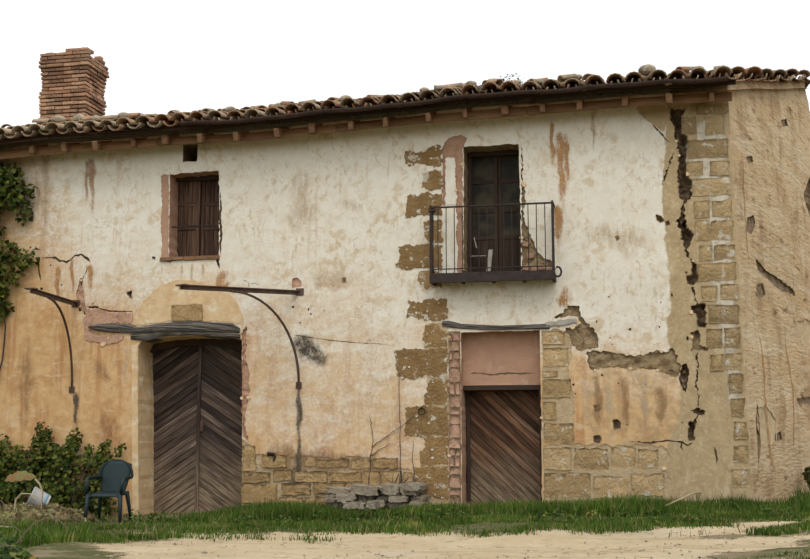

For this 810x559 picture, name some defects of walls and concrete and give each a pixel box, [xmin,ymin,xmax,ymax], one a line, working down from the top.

crack [32,248,90,282]
flaking render [75,278,133,346]
damp [294,335,326,363]
spalling [240,298,462,506]
spalling [395,135,467,289]
spalling [519,148,552,271]
spalling [540,305,689,502]
crack [629,328,700,450]
crack [652,107,699,307]
spalling [682,407,706,441]
spalling [686,302,708,351]
spalling [746,215,756,234]